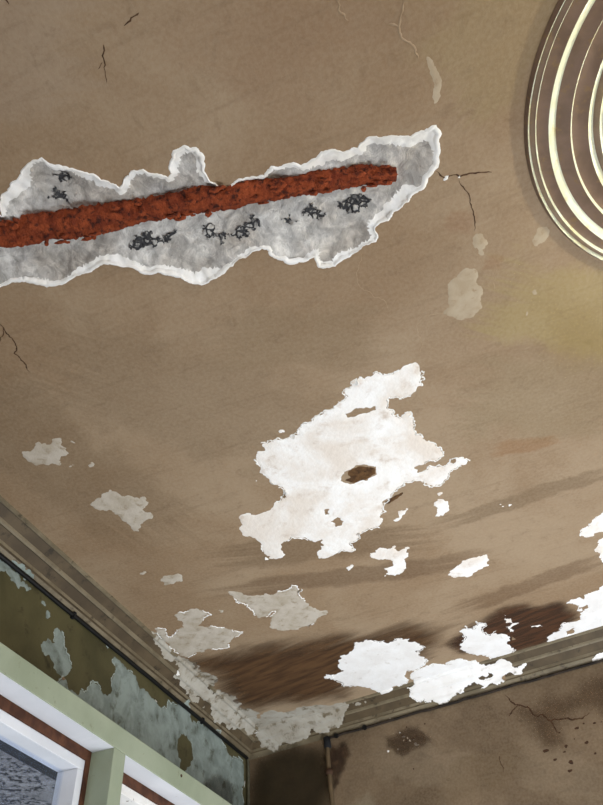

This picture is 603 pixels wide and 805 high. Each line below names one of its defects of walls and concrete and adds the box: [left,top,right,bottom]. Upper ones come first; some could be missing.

spalling [0,125,442,287]
peeling [239,362,470,560]
peeling [90,490,153,531]
peeling [370,546,409,576]
peeling [579,513,603,562]
peeling [228,585,328,631]
peeling [547,586,603,642]
damp [193,626,434,707]
peeling [324,619,527,705]
peeling [41,608,366,805]
flaking render [387,723,427,755]
damp [252,748,328,805]